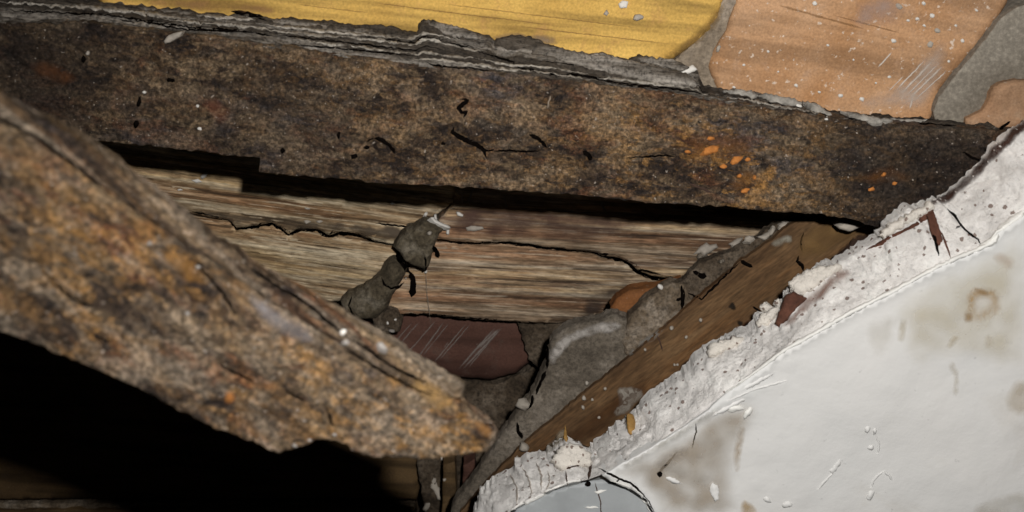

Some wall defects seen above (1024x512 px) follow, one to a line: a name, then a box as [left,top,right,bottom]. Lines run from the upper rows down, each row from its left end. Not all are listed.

peeling [603,0,644,21]
peeling [163,31,185,44]
crack [451,98,547,159]
crack [367,137,395,154]
crack [583,151,593,160]
crack [628,152,675,160]
rust [685,136,719,156]
rust [719,156,756,193]
crack [947,209,981,244]
crack [192,212,753,439]
flaking render [473,120,1024,512]